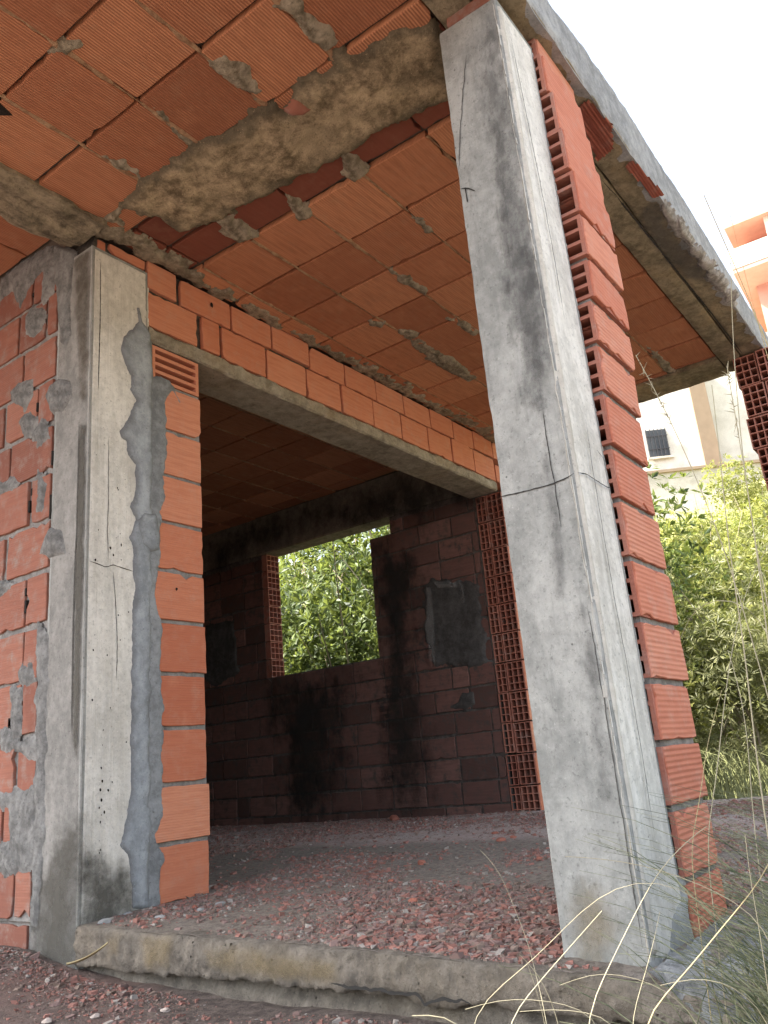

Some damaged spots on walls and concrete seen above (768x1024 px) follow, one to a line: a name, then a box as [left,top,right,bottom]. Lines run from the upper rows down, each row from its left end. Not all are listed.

crack [71,432,131,726]
crack [501,414,654,829]
damp [33,829,134,968]